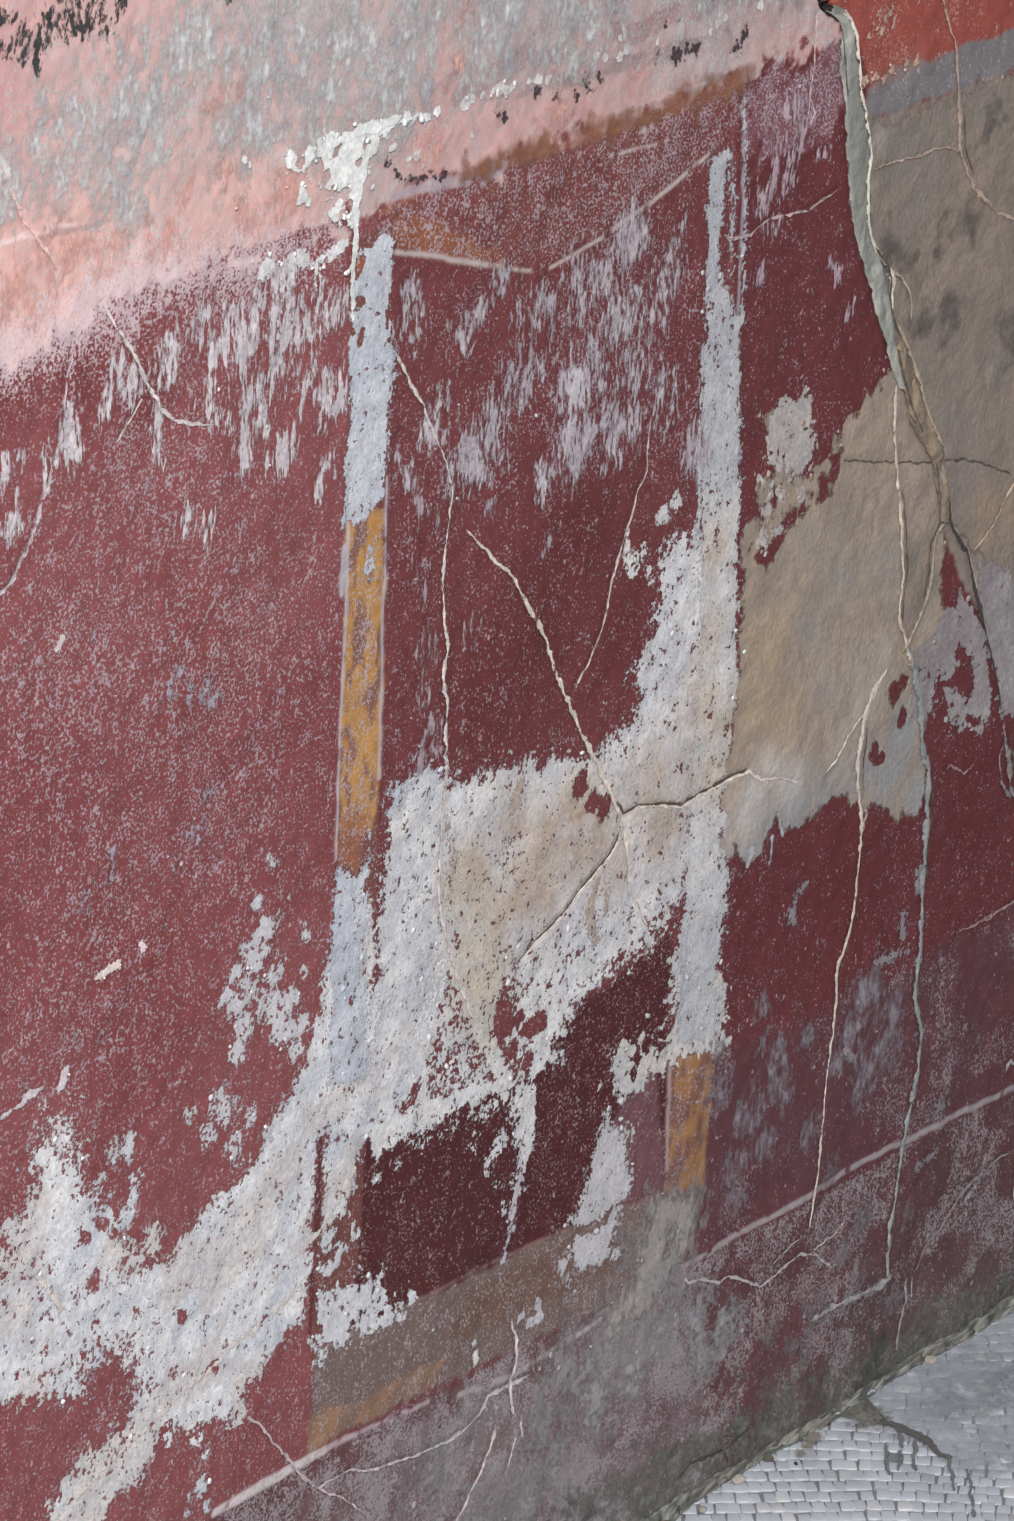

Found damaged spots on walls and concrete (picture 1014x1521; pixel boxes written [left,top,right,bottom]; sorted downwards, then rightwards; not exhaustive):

crack [103,305,214,445]
water stain [828,251,856,323]
flaking render [702,74,1014,874]
water stain [0,0,832,1217]
crack [394,0,1014,1351]
flaking render [0,489,735,1521]
water stain [828,863,926,1112]
water stain [912,1146,939,1175]
crack [244,1321,529,1521]
water stain [393,1212,748,1521]
water stain [761,1276,902,1392]